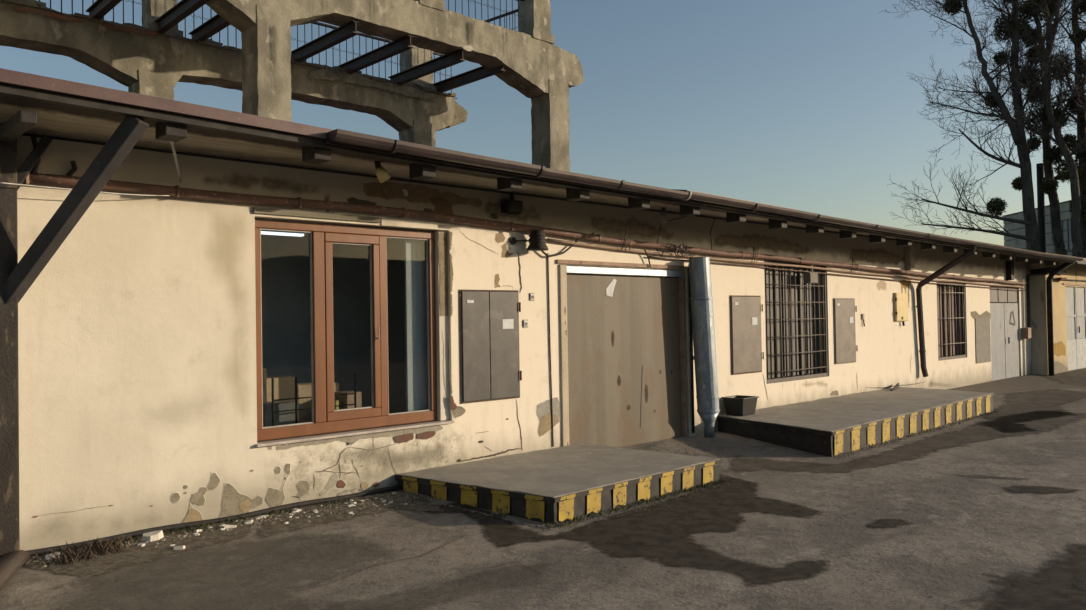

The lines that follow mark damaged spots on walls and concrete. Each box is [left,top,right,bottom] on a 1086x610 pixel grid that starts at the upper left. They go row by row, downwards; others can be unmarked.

peeling [341,182,499,219]
peeling [494,232,517,259]
spalling [450,396,468,419]
spalling [536,396,560,438]
spalling [170,425,443,523]
crack [291,439,396,498]